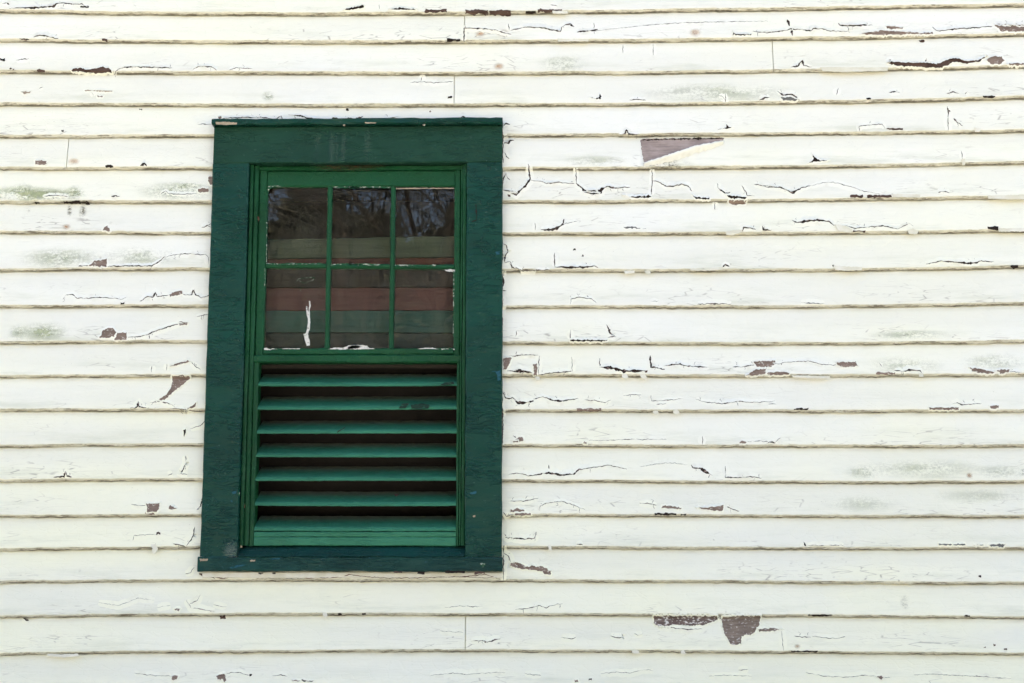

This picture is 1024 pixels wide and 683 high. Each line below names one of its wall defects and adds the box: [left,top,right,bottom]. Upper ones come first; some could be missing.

peeling [342,4,447,13]
spalling [465,9,511,17]
peeling [885,54,1024,71]
peeling [714,183,754,207]
peeling [98,287,209,342]
peeling [595,358,648,380]
peeling [745,357,859,379]
peeling [150,358,202,414]
crack [257,355,775,680]
peeling [639,500,740,516]
peeling [509,560,553,577]
peeling [652,612,785,647]